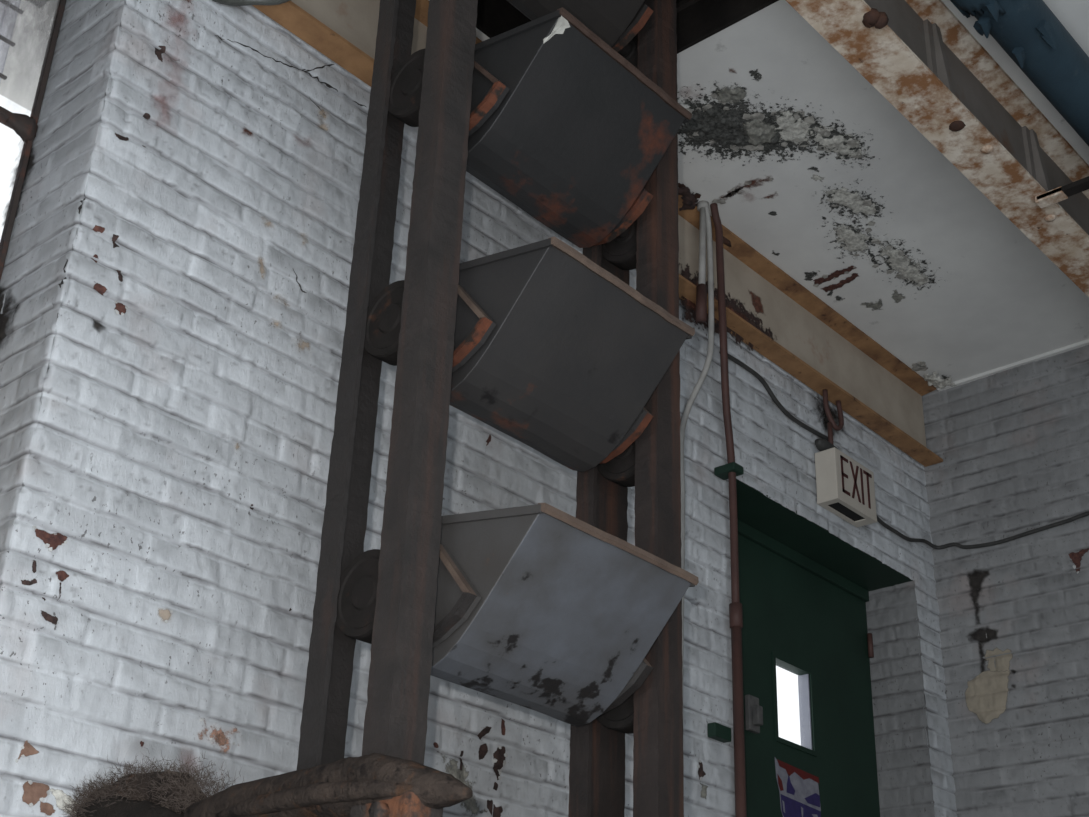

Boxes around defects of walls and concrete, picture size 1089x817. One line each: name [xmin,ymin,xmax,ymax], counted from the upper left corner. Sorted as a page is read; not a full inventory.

crack [214,35,366,116]
peeling [92,225,119,248]
rust [804,266,859,296]
peeling [115,301,128,316]
peeling [32,526,68,552]
peeling [21,560,58,625]
peeling [56,570,69,598]
spalling [15,741,39,763]
peeling [433,718,508,817]
spalling [22,780,77,816]